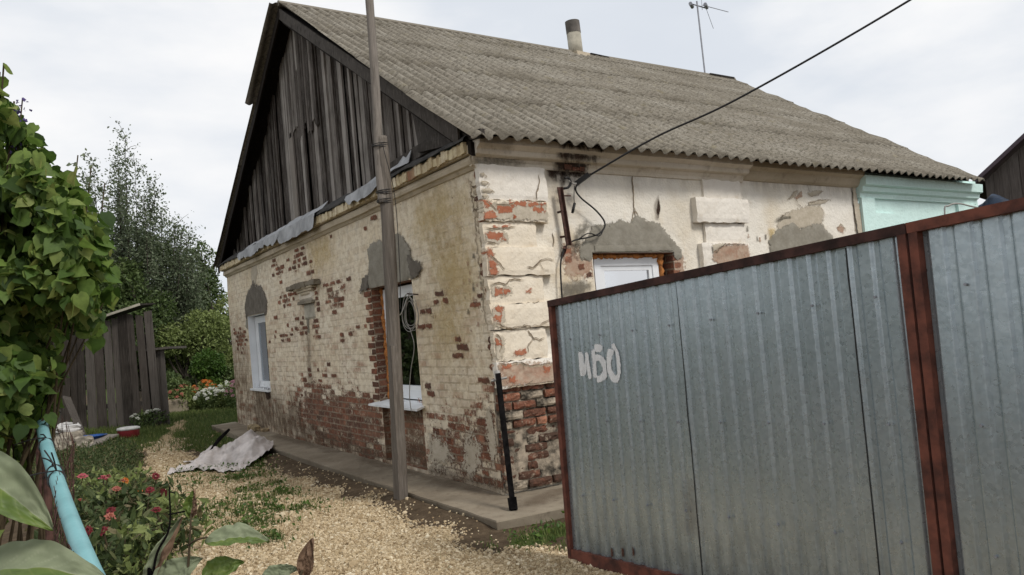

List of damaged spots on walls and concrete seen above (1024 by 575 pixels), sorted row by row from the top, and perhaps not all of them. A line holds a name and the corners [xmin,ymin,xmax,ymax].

leakage [547,141,604,184]
spalling [776,185,831,229]
peeling [561,243,594,281]
peeling [712,227,766,263]
peeling [269,247,351,343]
spalling [417,171,562,493]